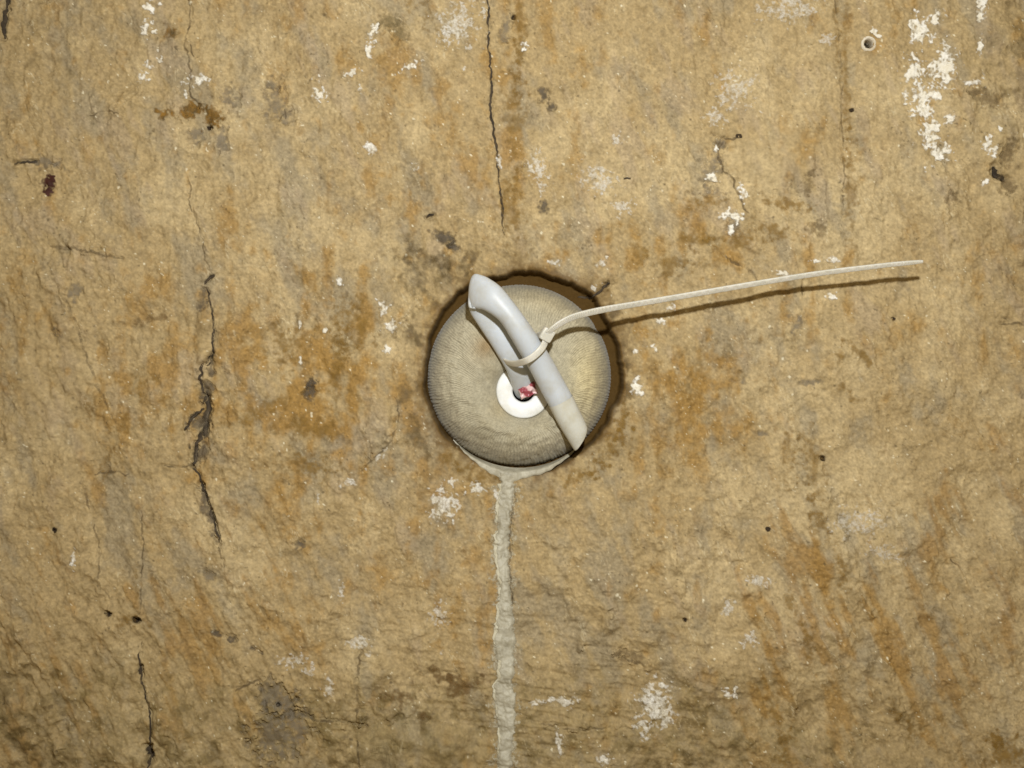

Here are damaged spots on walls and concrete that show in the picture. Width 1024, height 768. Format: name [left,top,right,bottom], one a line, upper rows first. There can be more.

crack [486,0,504,226]
leakage [902,9,985,169]
leakage [976,0,988,22]
crack [184,275,220,542]
crack [137,653,154,768]
leakage [428,473,578,768]